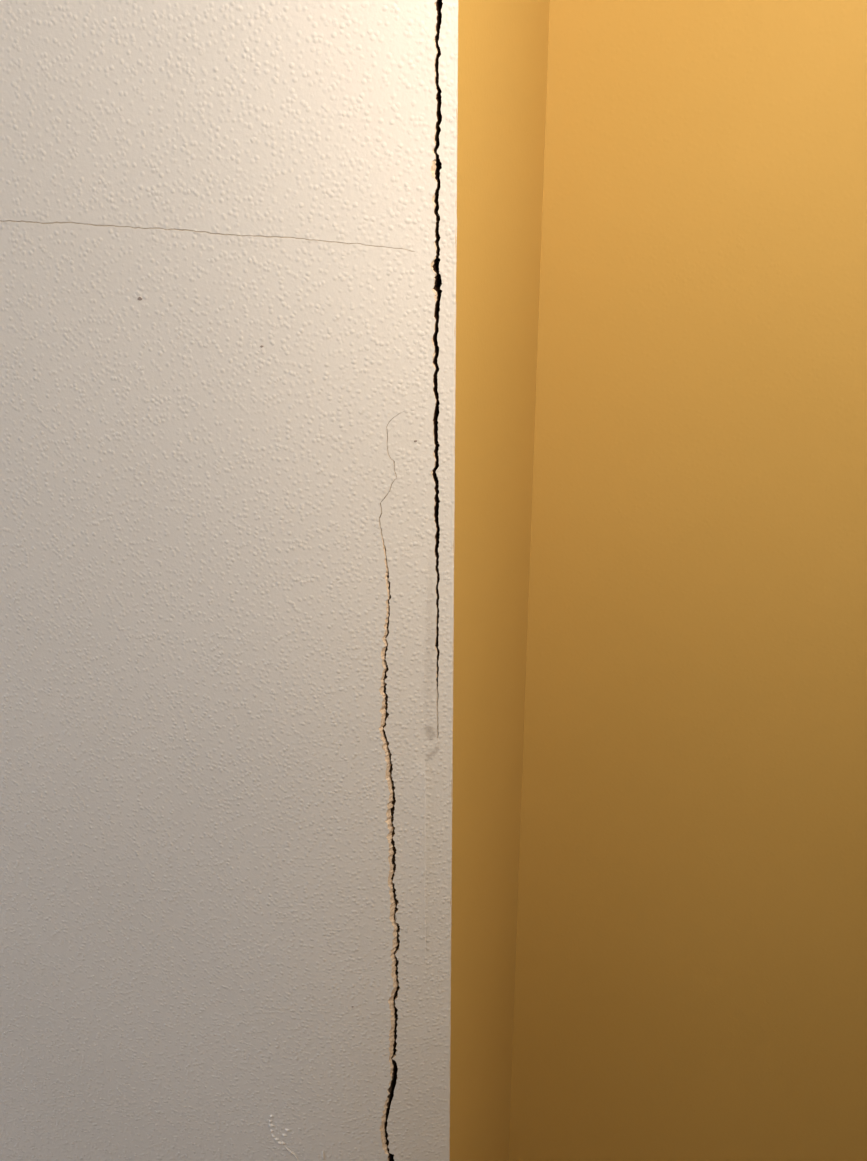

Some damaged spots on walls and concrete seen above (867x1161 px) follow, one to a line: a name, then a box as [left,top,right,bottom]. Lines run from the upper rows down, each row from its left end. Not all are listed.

crack [0,0,443,738]
crack [378,411,404,1161]